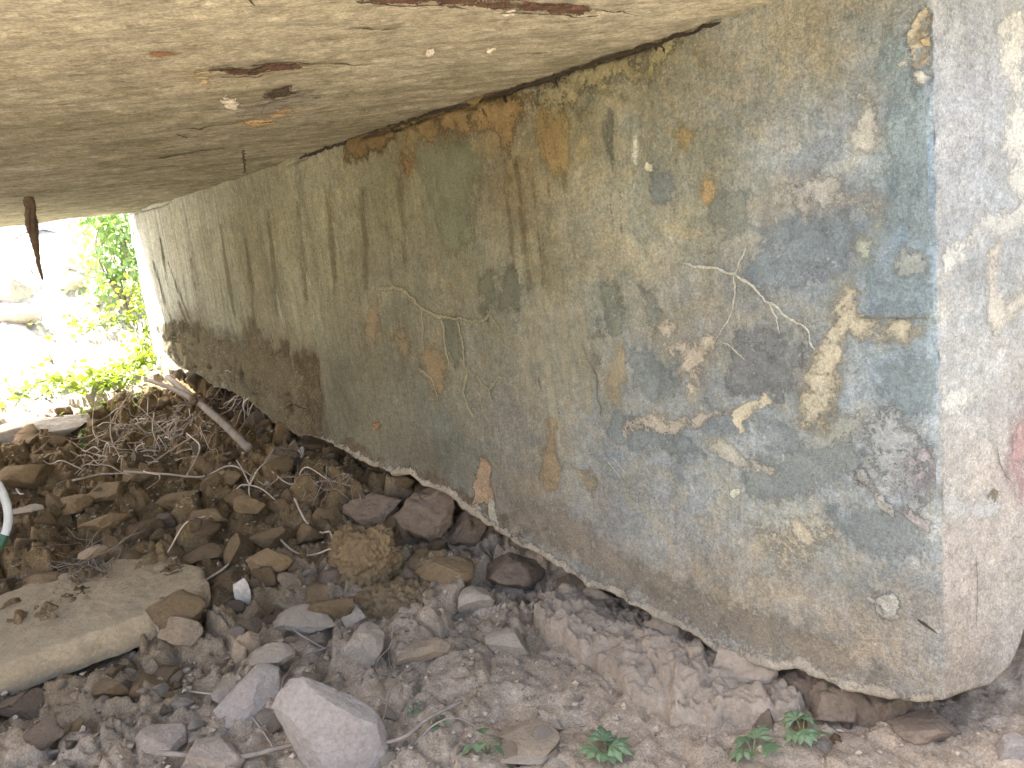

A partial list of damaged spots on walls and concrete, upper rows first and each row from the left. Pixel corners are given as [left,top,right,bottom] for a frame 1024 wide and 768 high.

corrosion [208,62,360,78]
corrosion [356,0,637,18]
spalling [897,7,932,84]
water stain [153,239,324,437]
crack [379,284,510,418]
peeling [622,316,774,475]
crack [684,244,815,360]
peeling [796,276,937,532]
spalling [321,435,935,702]